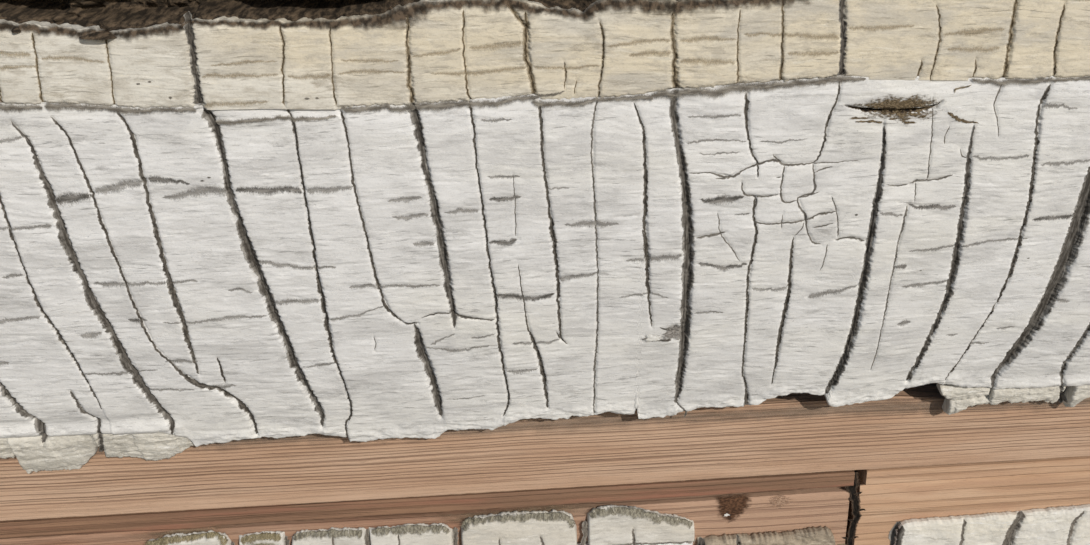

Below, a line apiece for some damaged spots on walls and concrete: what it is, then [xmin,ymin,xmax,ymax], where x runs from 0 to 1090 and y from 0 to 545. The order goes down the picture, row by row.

crack [902,0,1090,387]
crack [0,0,956,452]
crack [1058,322,1090,403]
peeling [936,383,1090,415]
peeling [0,432,194,474]
crack [363,529,371,545]
peeling [148,504,695,545]
crack [621,529,705,545]
crack [837,472,865,545]
crack [959,520,967,545]
crack [1002,511,1026,545]
crack [1067,512,1084,545]